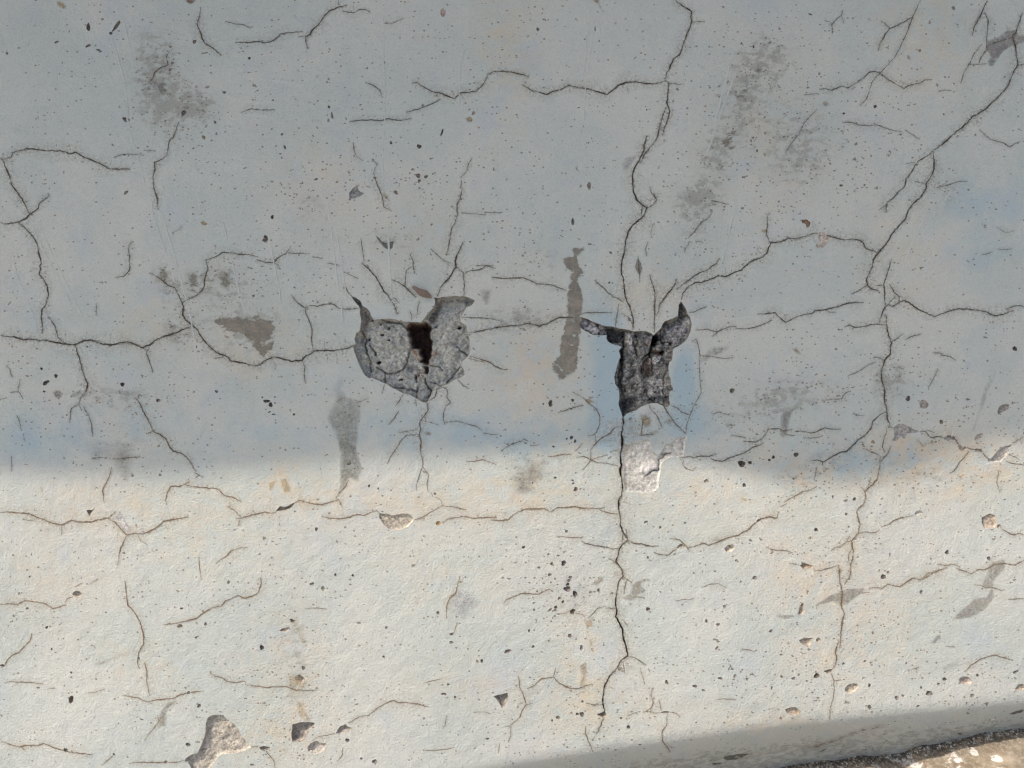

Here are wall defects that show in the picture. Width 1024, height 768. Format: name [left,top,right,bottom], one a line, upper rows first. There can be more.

spalling [352,286,475,403]